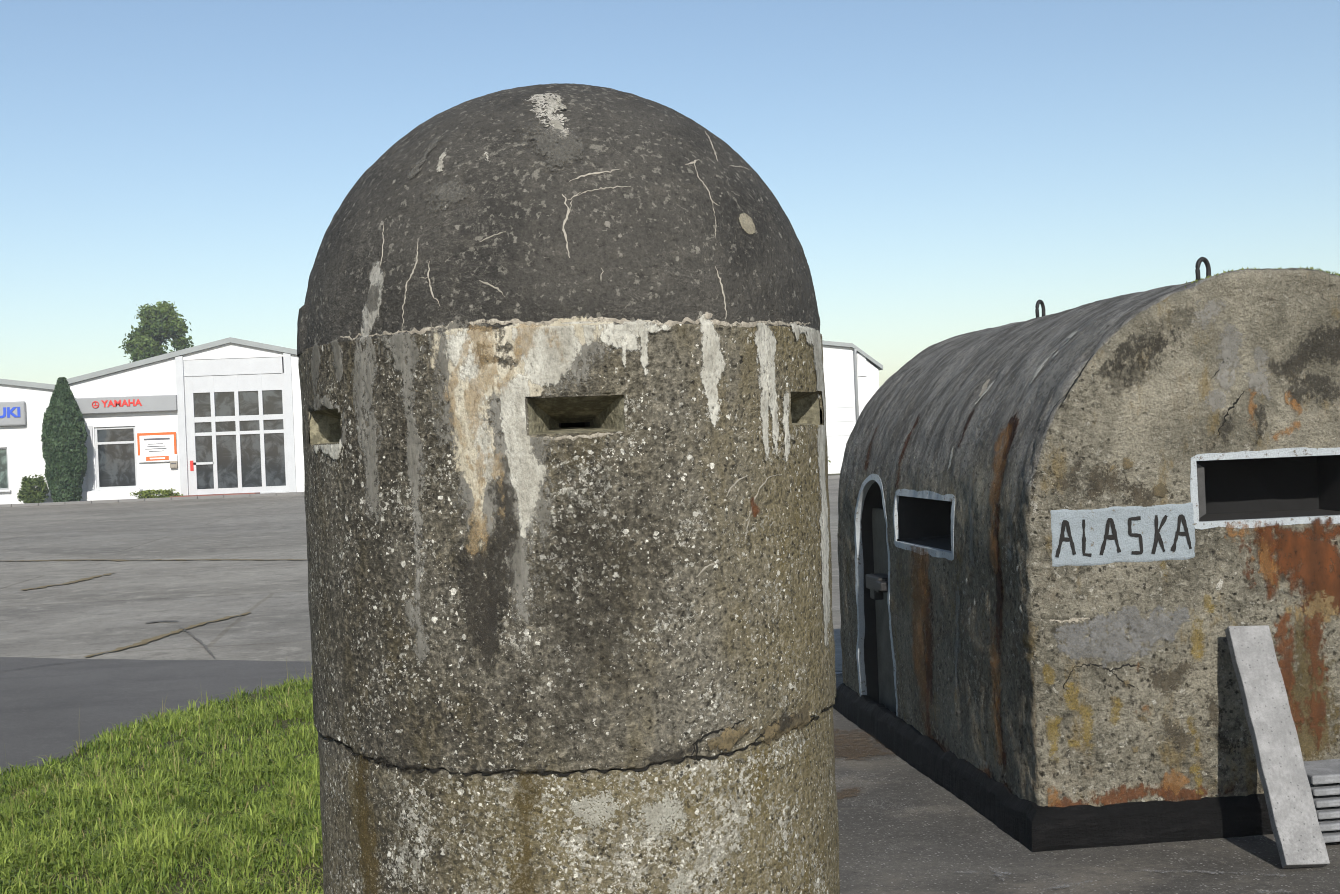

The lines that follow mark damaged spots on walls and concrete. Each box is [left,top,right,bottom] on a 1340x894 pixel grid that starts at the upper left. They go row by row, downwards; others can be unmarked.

peeling [513,93,583,170]
leakage [699,314,726,427]
leakage [754,323,791,462]
leakage [311,261,671,672]
leakage [791,322,830,646]
crack [323,672,842,776]
spalling [649,701,811,765]
corrosion [989,413,1019,771]
crack [1063,663,1145,702]
corrosion [1225,517,1340,749]